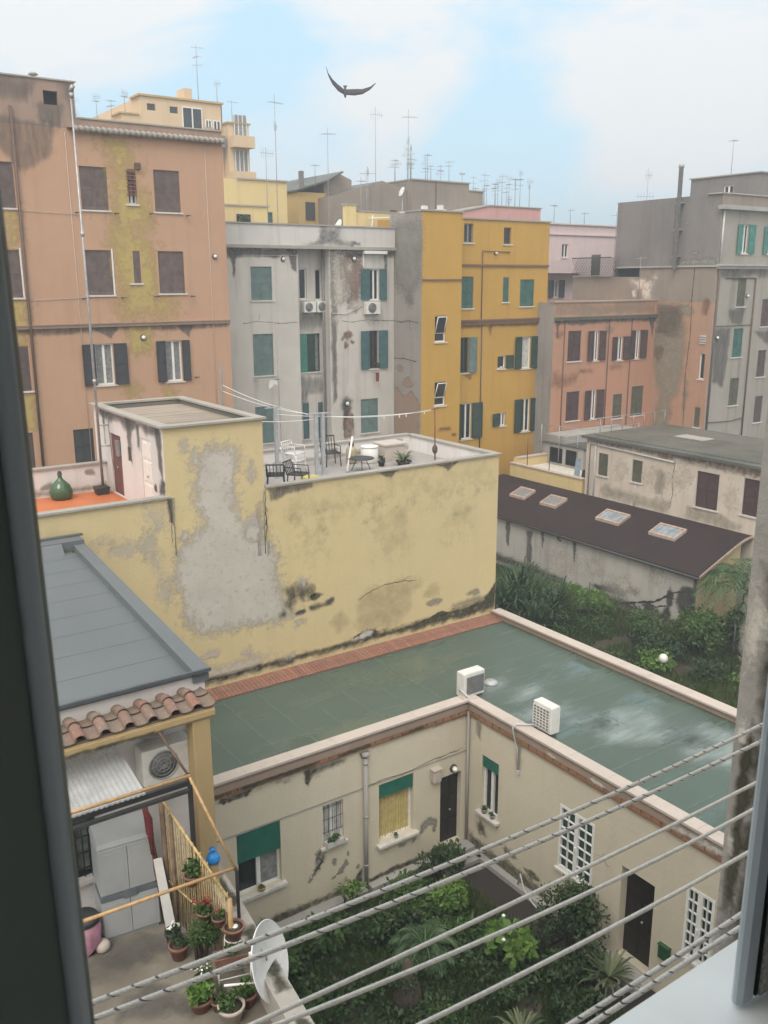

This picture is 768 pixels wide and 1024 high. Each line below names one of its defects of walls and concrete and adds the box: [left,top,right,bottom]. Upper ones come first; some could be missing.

leakage [319,230,360,416]
peeling [171,439,303,635]
leakage [496,522,568,584]
leakage [205,583,495,684]
flaking render [308,851,359,883]